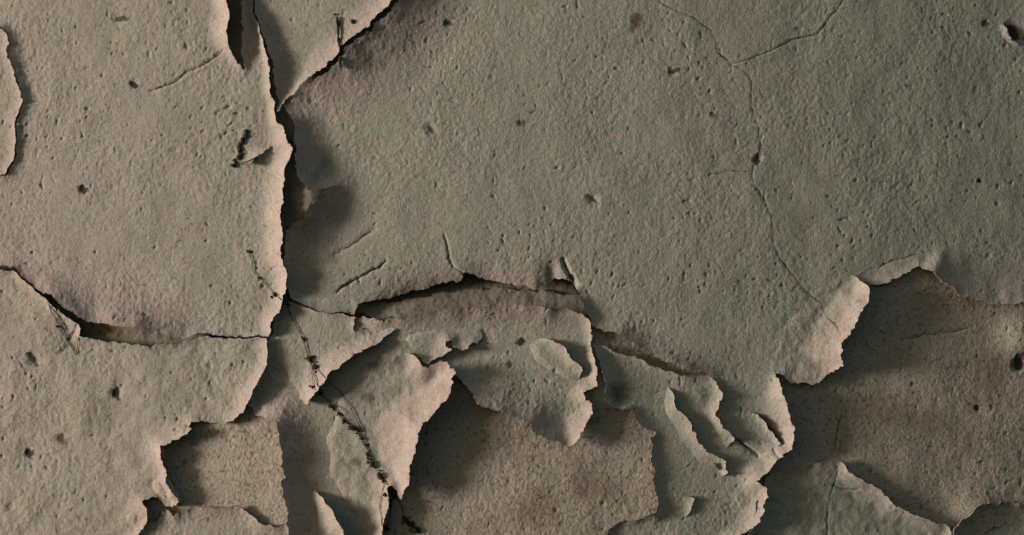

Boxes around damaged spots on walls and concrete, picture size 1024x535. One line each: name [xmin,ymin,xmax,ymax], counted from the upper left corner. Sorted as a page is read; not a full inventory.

crack [0,27,23,176]
peeling [0,28,23,175]
peeling [254,0,399,112]
crack [658,0,843,334]
crack [0,265,263,347]
peeling [126,395,288,535]
peeling [275,301,658,535]
peeling [683,496,695,517]
peeling [664,377,735,476]
peeling [735,254,1024,535]